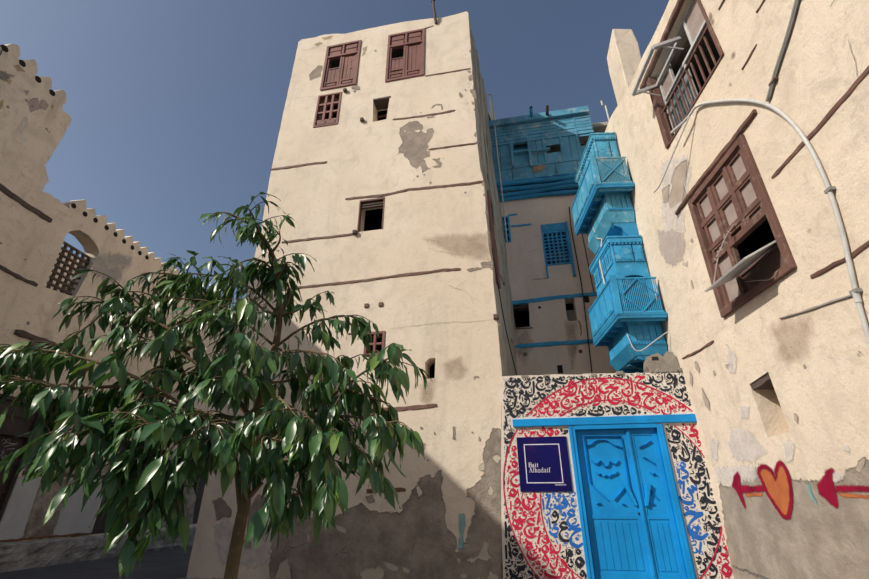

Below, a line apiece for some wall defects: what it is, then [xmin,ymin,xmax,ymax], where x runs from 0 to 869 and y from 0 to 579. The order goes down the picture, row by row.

spalling [398,104,443,183]
flaking render [269,428,503,579]
flaking render [710,405,869,579]